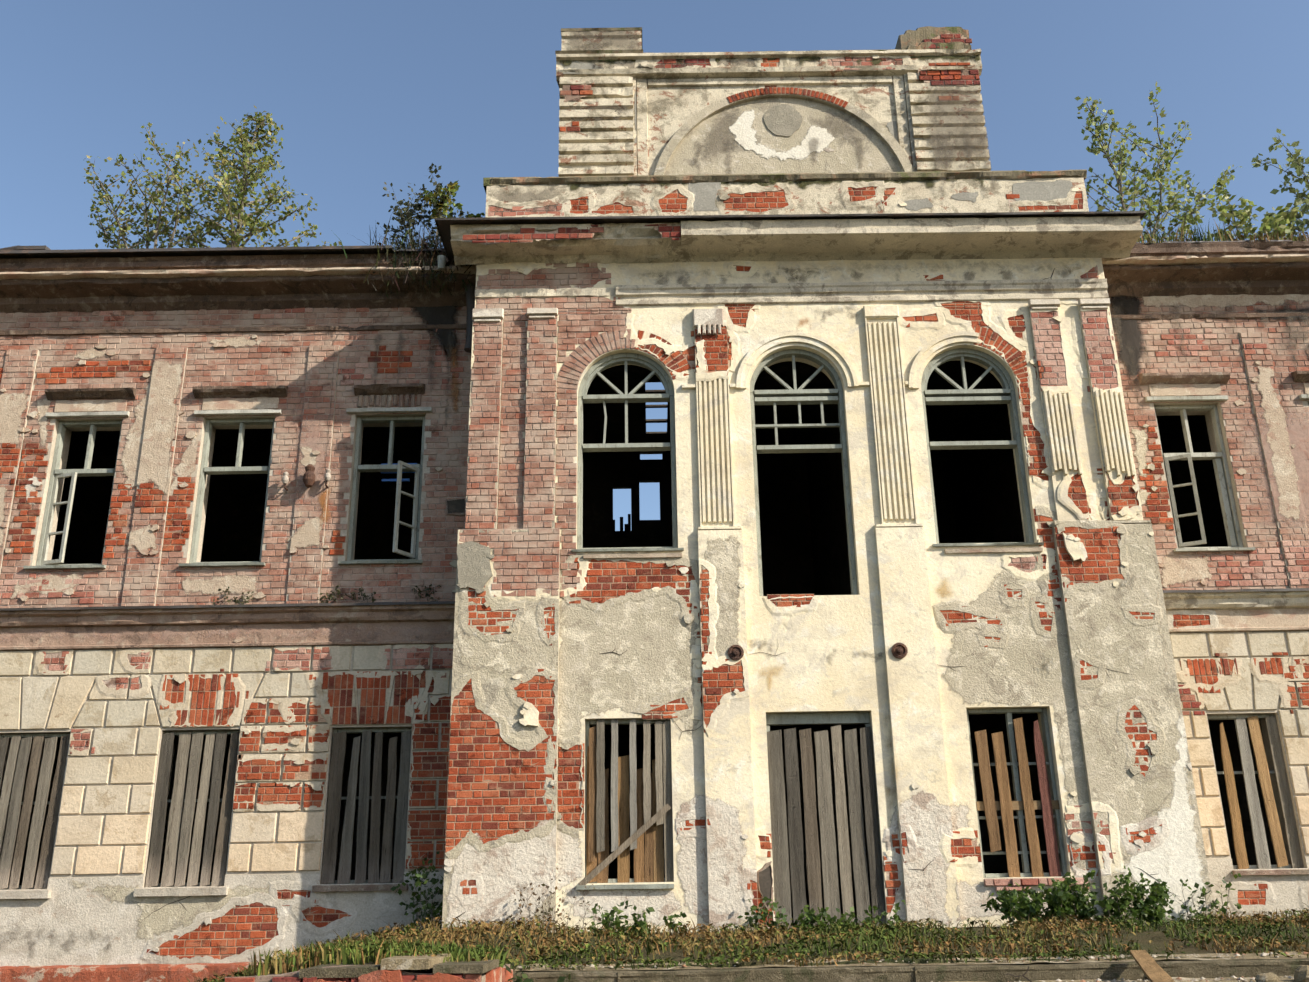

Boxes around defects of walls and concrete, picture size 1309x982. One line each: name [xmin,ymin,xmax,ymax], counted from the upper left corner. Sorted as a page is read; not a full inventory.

flaking render [462,182,797,243]
peeling [951,192,978,202]
flaking render [94,261,775,929]
peeling [882,258,1309,926]
flaking render [69,878,362,964]